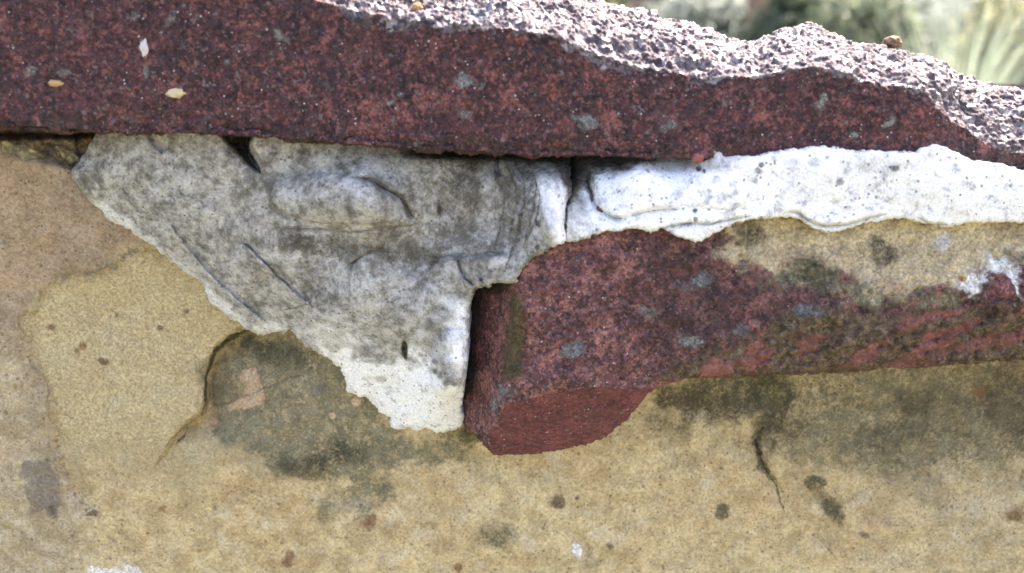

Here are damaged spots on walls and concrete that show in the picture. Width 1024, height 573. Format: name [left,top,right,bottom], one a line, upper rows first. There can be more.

crack [177,331,246,443]
leakage [282,439,362,477]
leakage [657,375,793,448]
crack [751,375,784,509]
leakage [821,495,844,520]